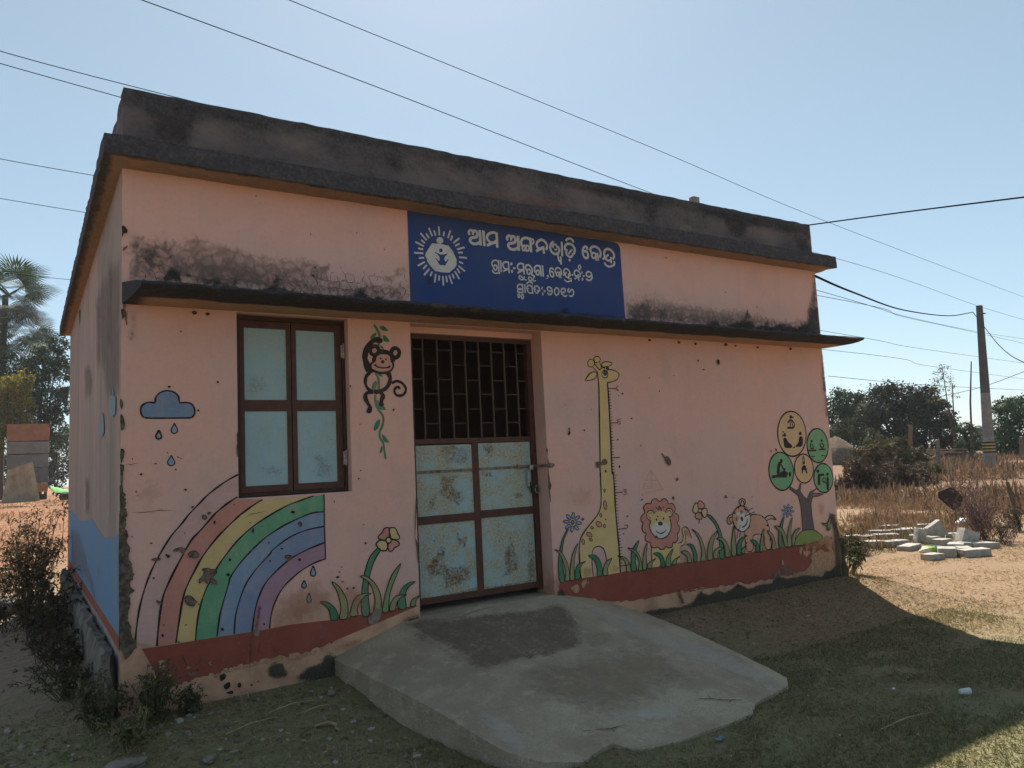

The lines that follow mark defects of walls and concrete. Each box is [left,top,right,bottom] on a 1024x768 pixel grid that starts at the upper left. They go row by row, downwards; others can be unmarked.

mould [133,240,400,300]
water stain [693,275,820,334]
flaking render [119,449,139,660]
flaking render [152,547,231,585]
corrosion [422,544,531,600]
peeling [186,644,329,694]